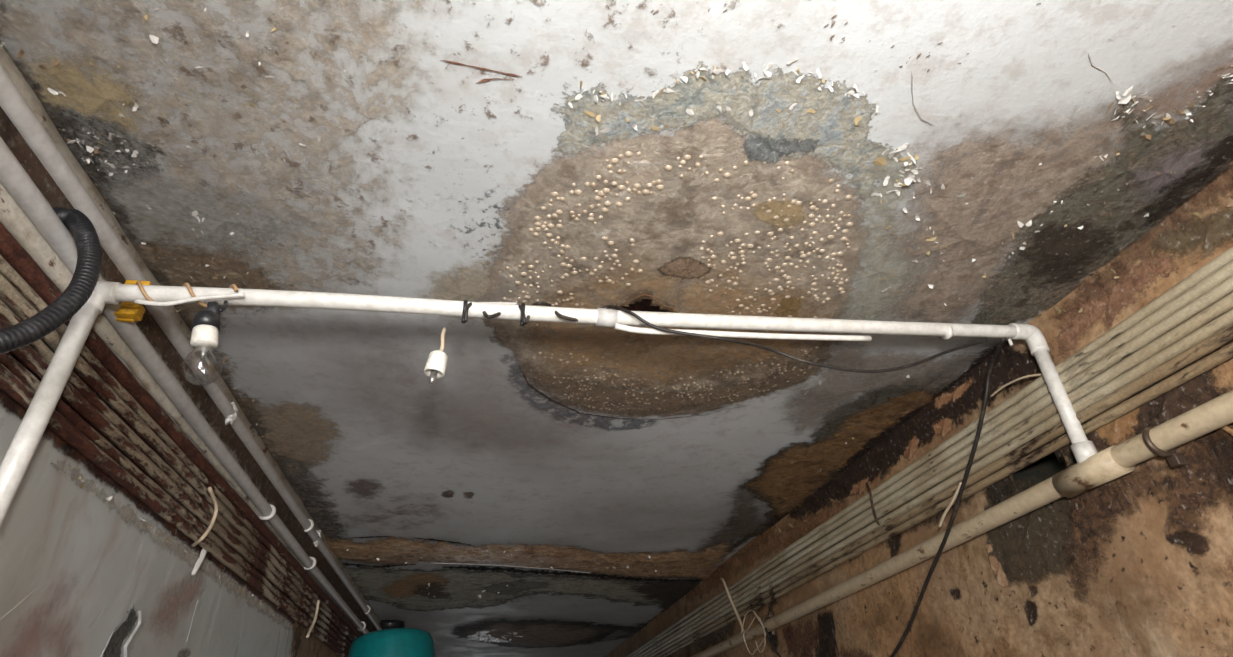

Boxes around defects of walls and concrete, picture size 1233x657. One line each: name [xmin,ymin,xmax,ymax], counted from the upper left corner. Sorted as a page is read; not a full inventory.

water stain [0,0,451,292]
peeling [551,58,919,201]
water stain [430,48,1233,520]
rust [0,389,27,419]
rust [72,370,204,499]
rust [43,397,352,643]
water stain [206,345,346,540]
water stain [449,579,700,649]
peeling [342,498,848,611]
water stain [768,611,872,657]
water stain [880,462,1044,557]
water stain [979,423,1233,657]